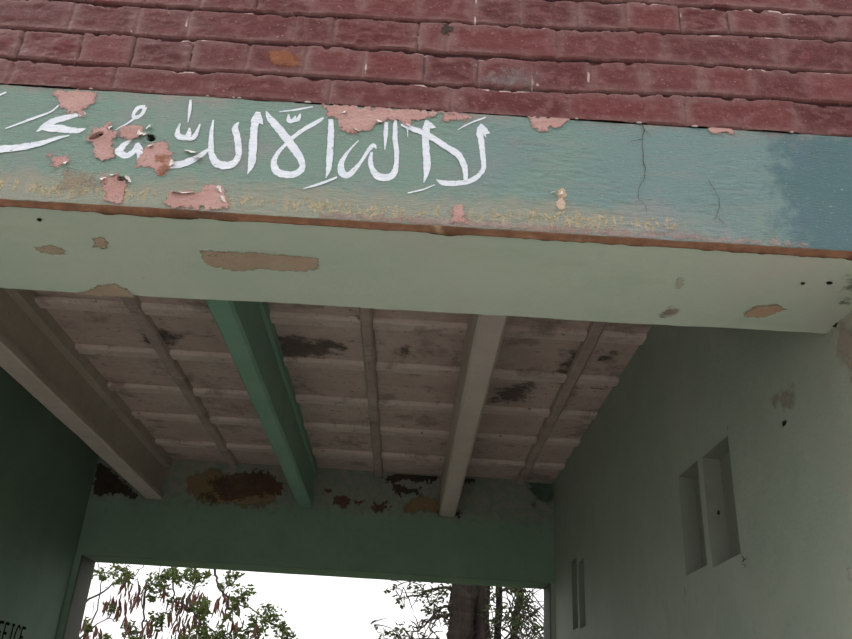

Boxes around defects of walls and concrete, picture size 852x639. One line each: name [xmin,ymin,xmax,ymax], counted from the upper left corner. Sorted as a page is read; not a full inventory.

peeling [51,88,96,118]
peeling [305,101,476,134]
peeling [46,153,70,168]
peeling [86,121,175,176]
crack [628,124,653,212]
spalling [0,172,852,261]
peeling [200,250,319,272]
peeling [744,305,787,317]
water stain [278,335,348,359]